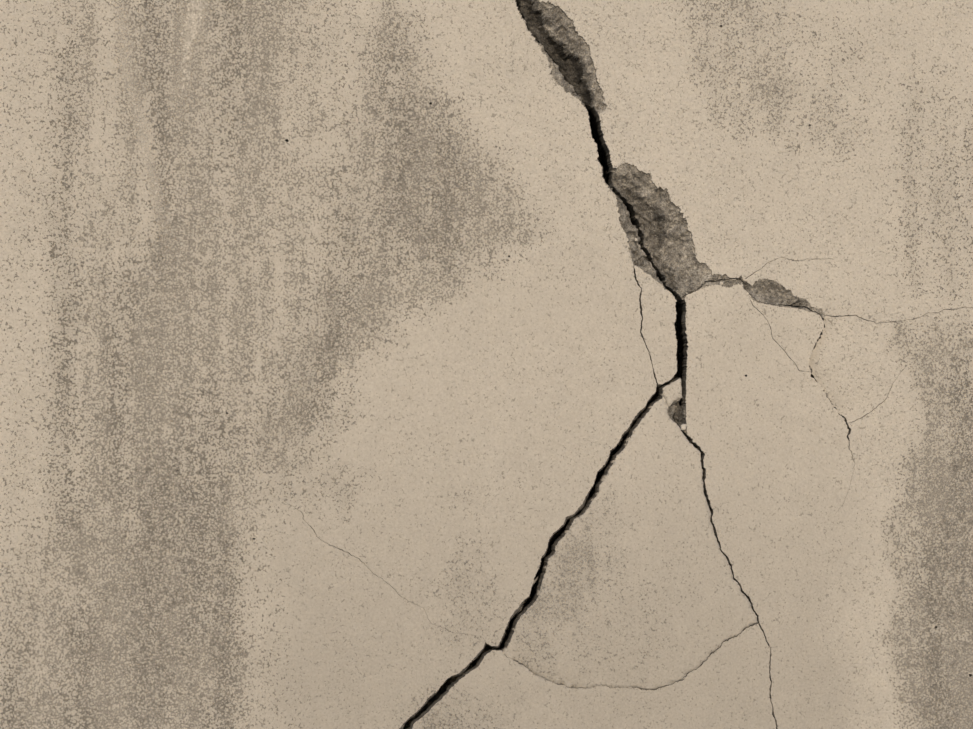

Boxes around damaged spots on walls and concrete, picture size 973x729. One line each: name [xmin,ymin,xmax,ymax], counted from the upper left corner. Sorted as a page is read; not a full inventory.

leakage [0,0,556,729]
spalling [516,0,607,114]
crack [288,0,968,729]
spalling [602,163,825,318]
leakage [877,311,973,729]
leakage [900,66,973,301]